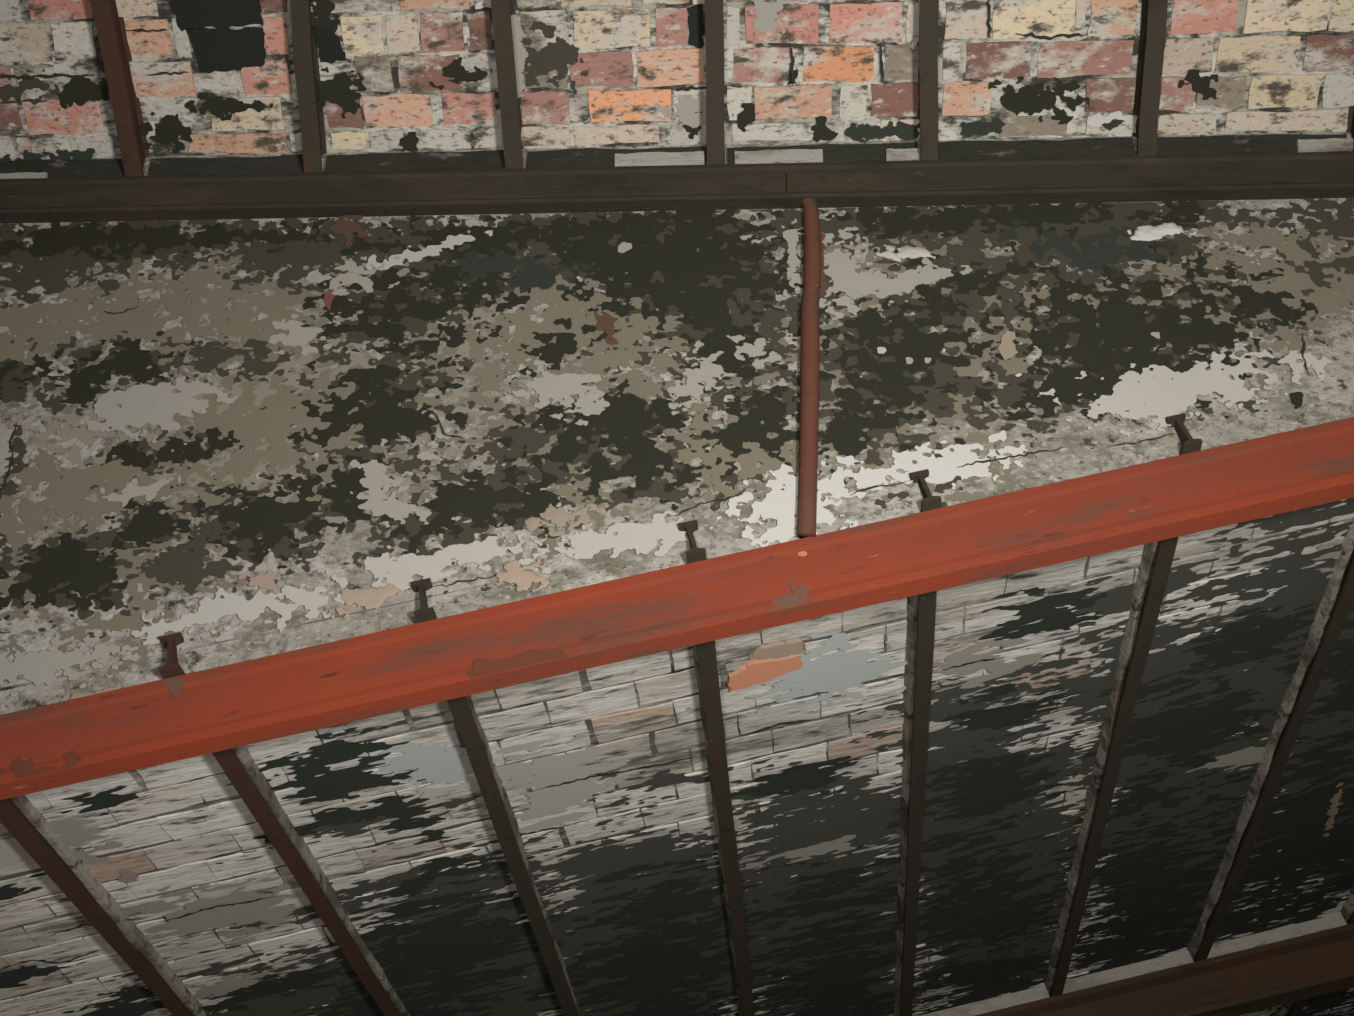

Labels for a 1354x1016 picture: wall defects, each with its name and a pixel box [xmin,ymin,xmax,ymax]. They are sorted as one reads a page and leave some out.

hole [168,0,266,73]
spalling [312,26,346,63]
spalling [687,4,705,49]
corrosion [998,330,1018,360]
spalling [525,500,606,536]
spalling [496,558,550,592]
spalling [329,580,401,618]
spalling [727,638,804,692]
spalling [69,685,121,700]